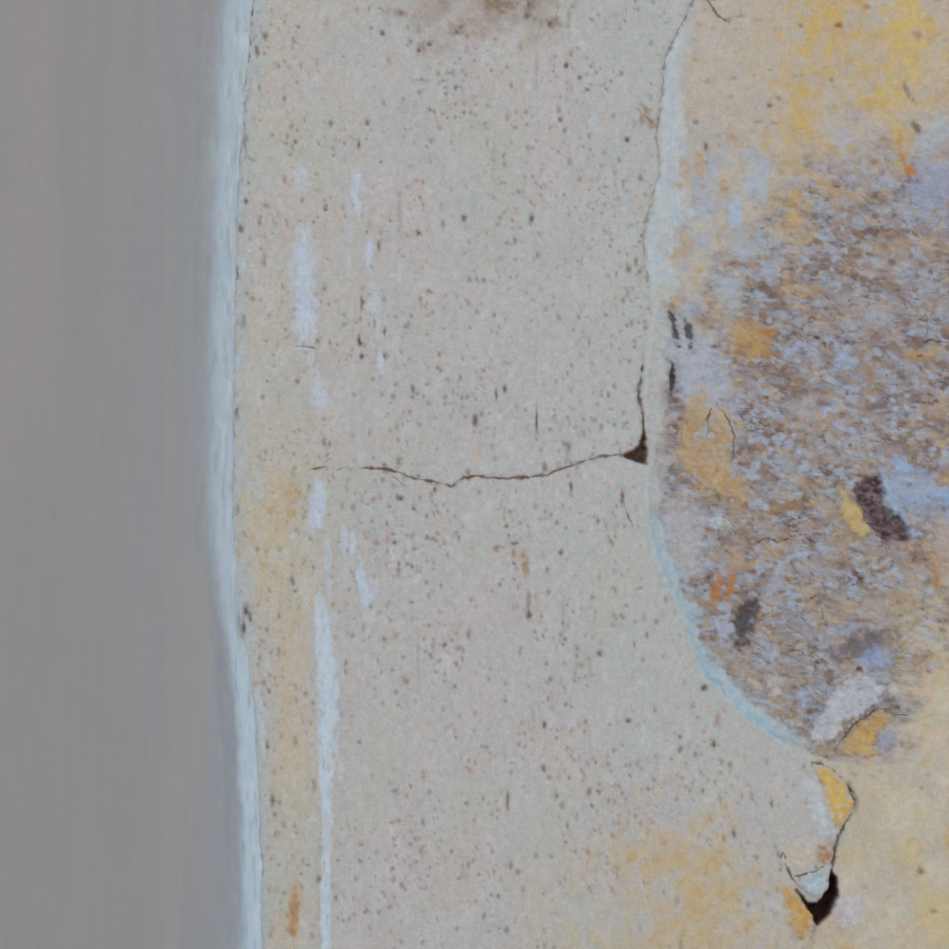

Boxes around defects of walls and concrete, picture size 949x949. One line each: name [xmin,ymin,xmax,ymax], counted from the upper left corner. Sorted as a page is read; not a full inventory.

crack [311,364,650,488]
crack [622,498,633,527]
spalling [639,19,949,789]
crack [780,759,871,949]